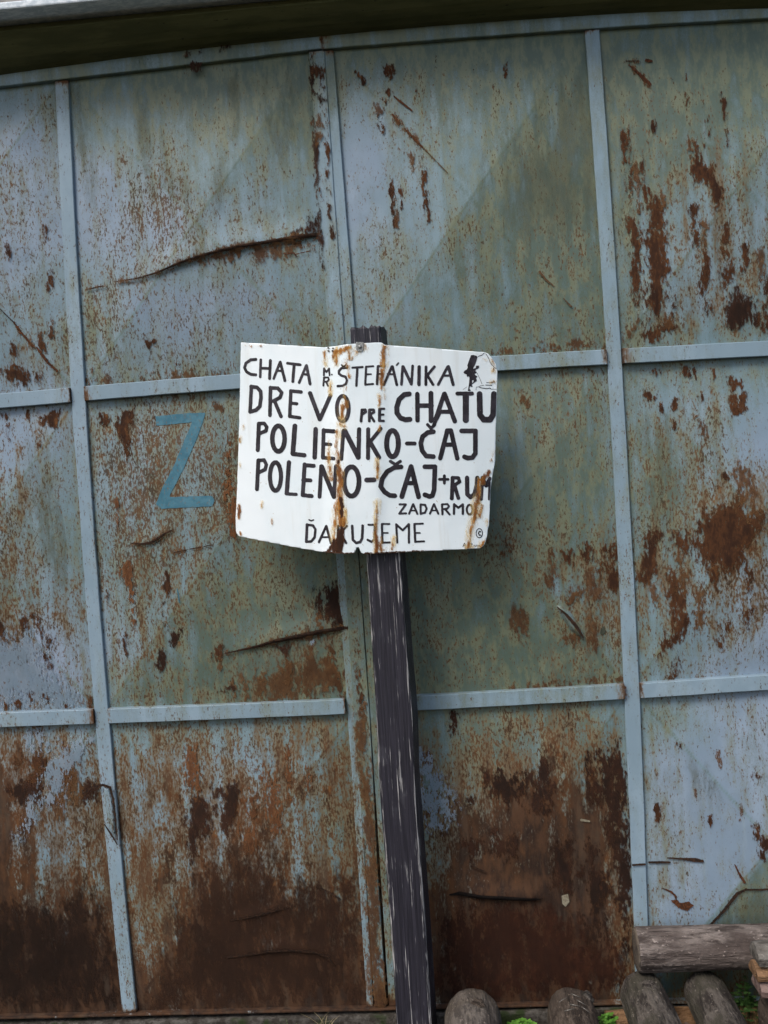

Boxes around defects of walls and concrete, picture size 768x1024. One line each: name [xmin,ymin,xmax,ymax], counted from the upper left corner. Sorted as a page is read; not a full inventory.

rust [0,341,47,386]
crack [86,232,320,291]
rust [193,50,335,269]
rust [388,179,403,229]
rust [620,128,678,344]
rust [686,118,768,334]
crack [224,624,348,656]
rust [635,460,768,680]
rust [6,749,102,821]
rust [150,580,388,1010]
crack [449,866,540,901]
rust [547,737,633,956]